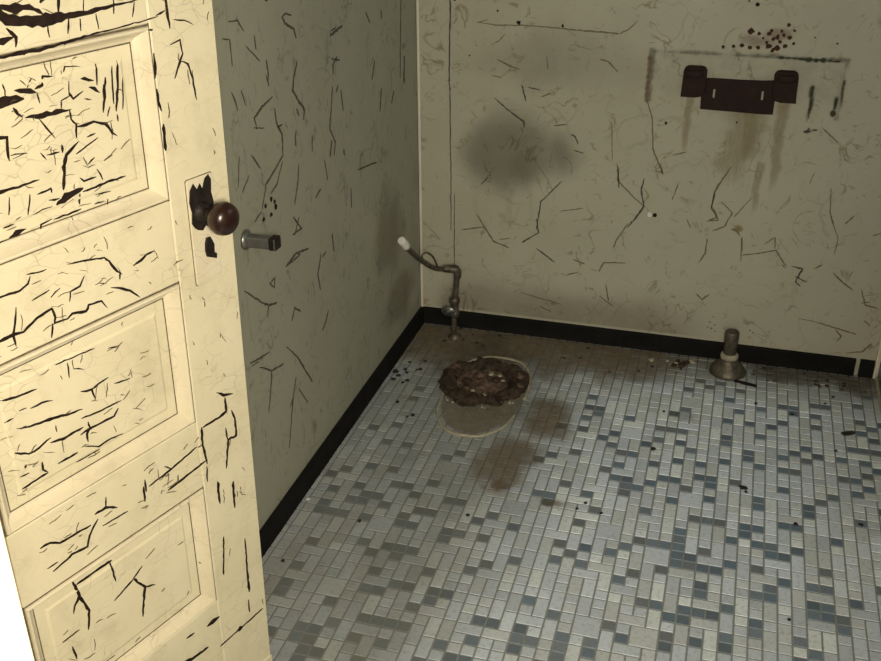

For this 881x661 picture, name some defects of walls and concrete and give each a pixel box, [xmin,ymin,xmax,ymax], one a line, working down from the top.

crack [366,0,405,110]
corrosion [722,23,796,52]
crack [448,0,686,306]
crack [687,166,878,353]
leakage [442,394,523,433]
leakage [478,443,532,490]